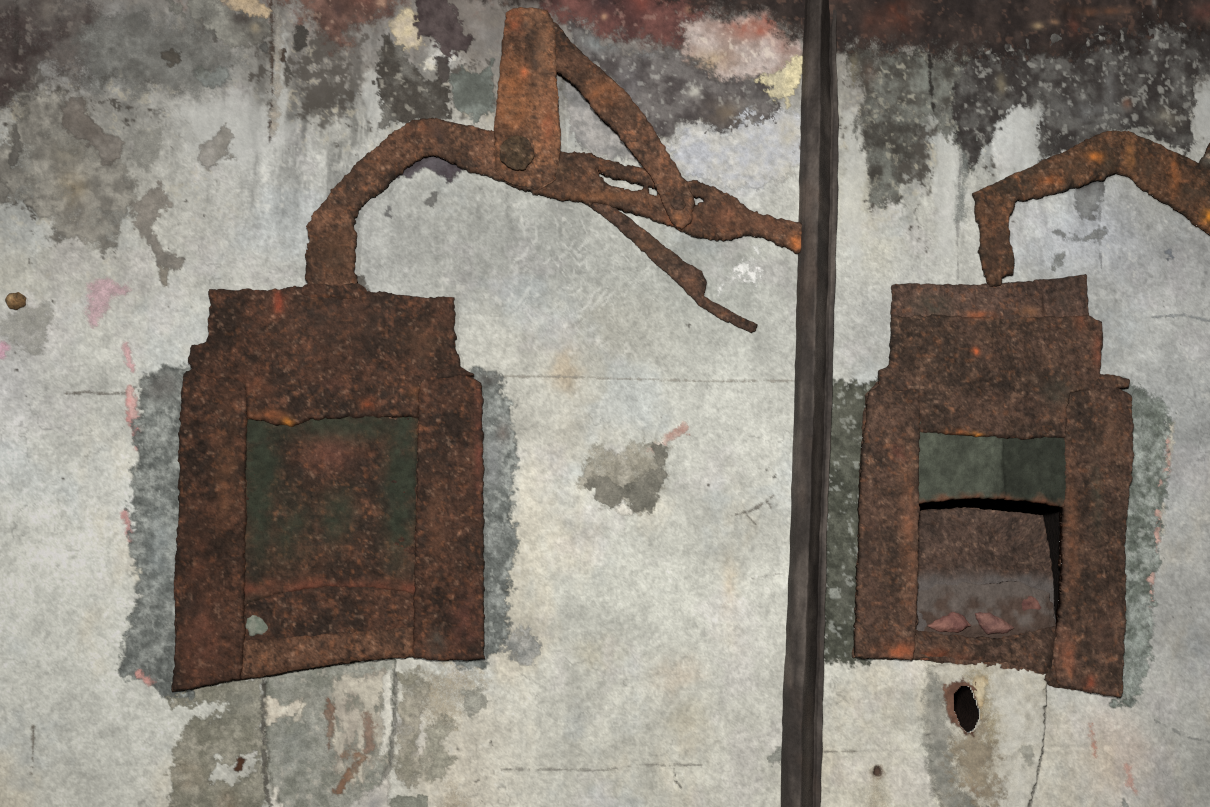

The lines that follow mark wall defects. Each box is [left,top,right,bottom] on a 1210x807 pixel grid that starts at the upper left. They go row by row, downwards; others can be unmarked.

leakage [197,123,234,171]
leakage [0,88,184,287]
leakage [717,245,764,296]
spalling [943,675,988,737]